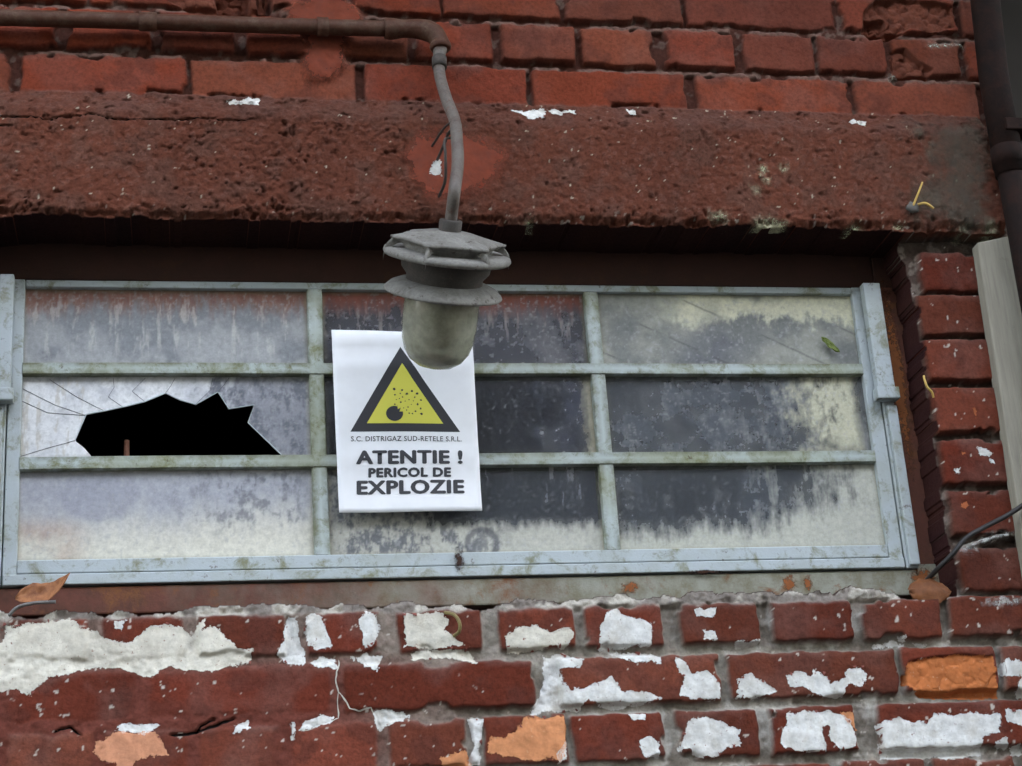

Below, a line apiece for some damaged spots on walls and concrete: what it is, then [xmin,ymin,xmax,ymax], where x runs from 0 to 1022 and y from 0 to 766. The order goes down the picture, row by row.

peeling [0,618,253,696]
peeling [277,613,338,669]
peeling [402,610,477,664]
peeling [439,624,662,766]
peeling [597,609,661,664]
peeling [675,657,721,702]
peeling [786,665,867,699]
peeling [871,635,1022,761]
peeling [93,723,169,766]
crack [171,719,234,737]
peeling [677,717,742,759]
peeling [781,710,857,755]